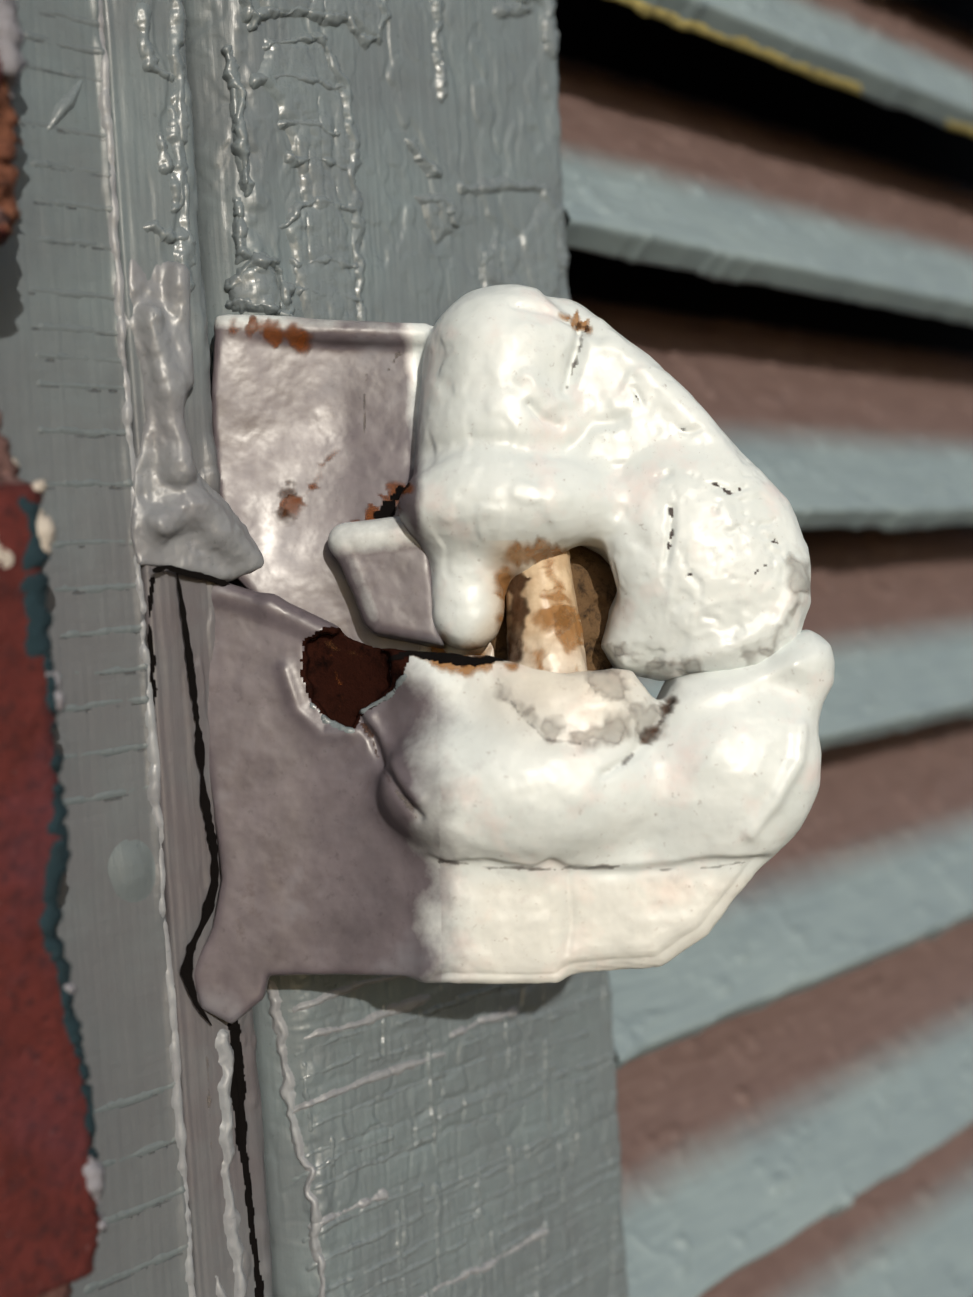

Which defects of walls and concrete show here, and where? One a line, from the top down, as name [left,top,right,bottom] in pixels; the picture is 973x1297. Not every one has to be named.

crack [21,3,105,82]
spalling [0,0,29,246]
crack [19,118,114,251]
crack [28,287,125,392]
rust [230,316,309,352]
rust [278,481,316,519]
rust [353,483,412,522]
rust [414,539,617,675]
crack [361,723,377,755]
crack [438,860,543,871]
crack [54,565,264,1297]
crack [266,976,622,1297]